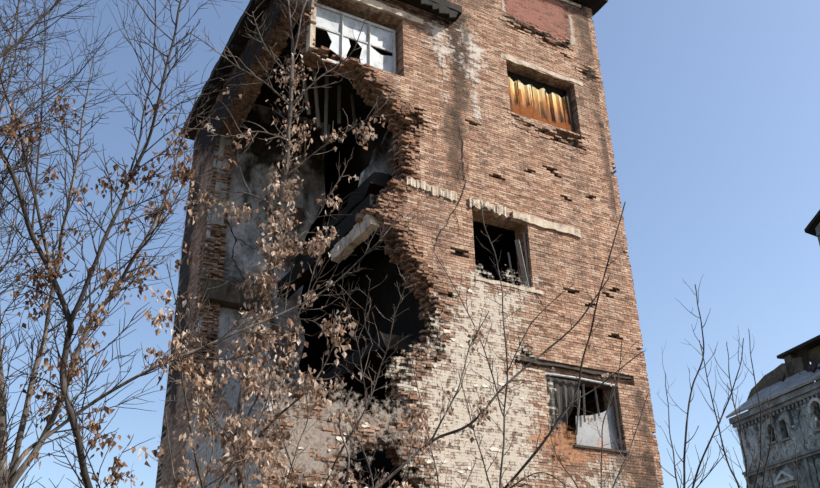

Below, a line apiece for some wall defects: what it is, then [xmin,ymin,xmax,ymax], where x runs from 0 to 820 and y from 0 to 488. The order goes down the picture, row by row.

leakage [425,14,485,183]
spalling [398,115,425,145]
spalling [525,124,577,148]
peeling [182,249,635,488]
leakage [736,396,820,448]
leakage [748,453,820,485]